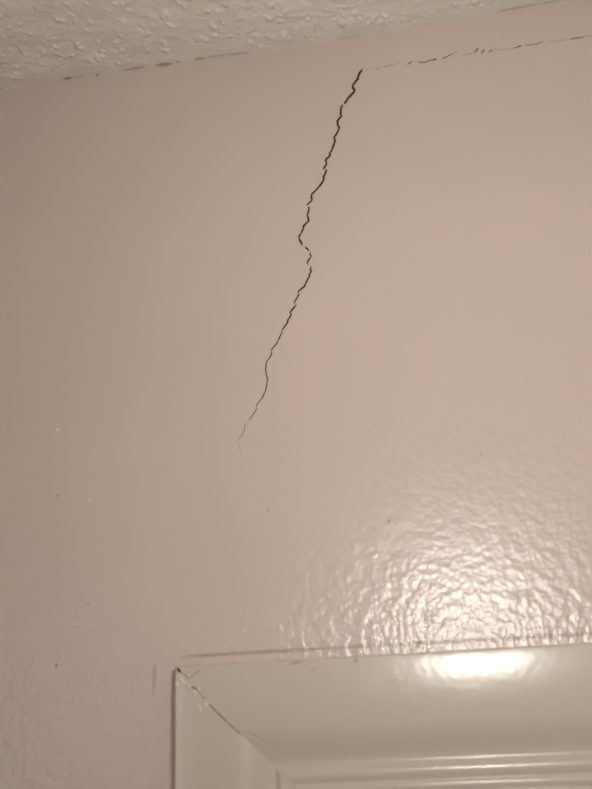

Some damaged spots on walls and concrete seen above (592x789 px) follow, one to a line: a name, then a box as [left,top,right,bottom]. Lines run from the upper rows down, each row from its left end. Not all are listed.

crack [255,69,363,411]